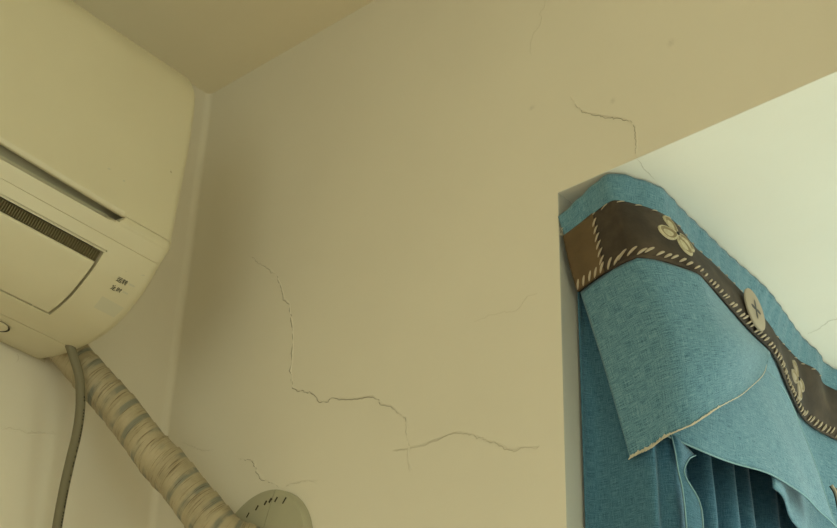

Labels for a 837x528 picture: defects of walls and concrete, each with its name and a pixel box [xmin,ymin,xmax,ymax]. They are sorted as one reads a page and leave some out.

crack [250,257,539,471]